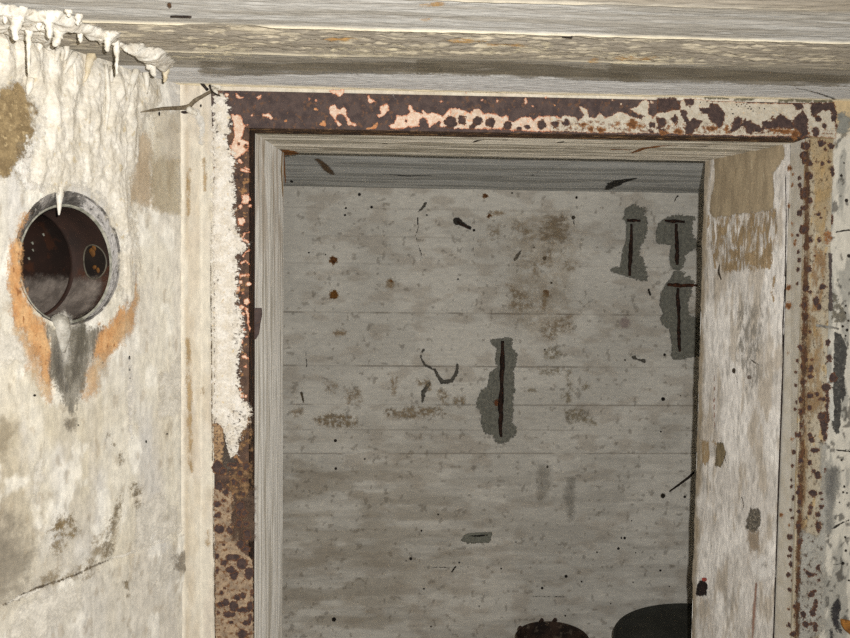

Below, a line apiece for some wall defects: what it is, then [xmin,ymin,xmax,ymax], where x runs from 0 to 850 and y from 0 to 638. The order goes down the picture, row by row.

corrosion [7,239,54,401]
leakage [46,324,101,430]
leakage [0,2,180,318]
corrosion [84,284,138,397]
leakage [181,84,253,474]
peeling [315,413,358,427]
spalling [476,337,518,444]
peeling [319,89,836,360]
corrosion [551,97,839,638]
corrosion [211,460,254,638]
leakage [231,488,256,541]